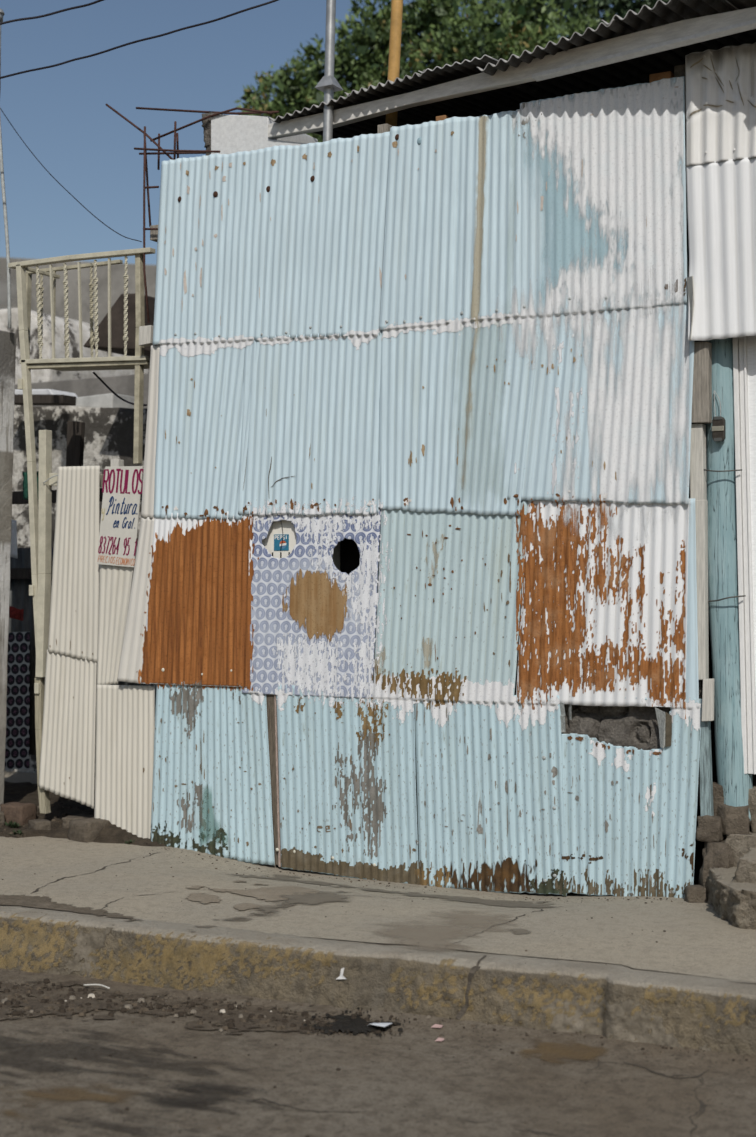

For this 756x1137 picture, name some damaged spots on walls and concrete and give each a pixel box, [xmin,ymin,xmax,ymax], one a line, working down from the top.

peeling [159,77,690,539]
rust [268,499,336,512]
peeling [155,682,214,833]
rust [138,502,259,691]
rust [282,569,347,642]
peeling [281,728,432,885]
peeling [233,482,560,760]
rust [330,638,467,749]
peeling [424,753,580,853]
rust [415,844,694,898]
rust [504,493,686,719]
crack [455,902,544,1020]